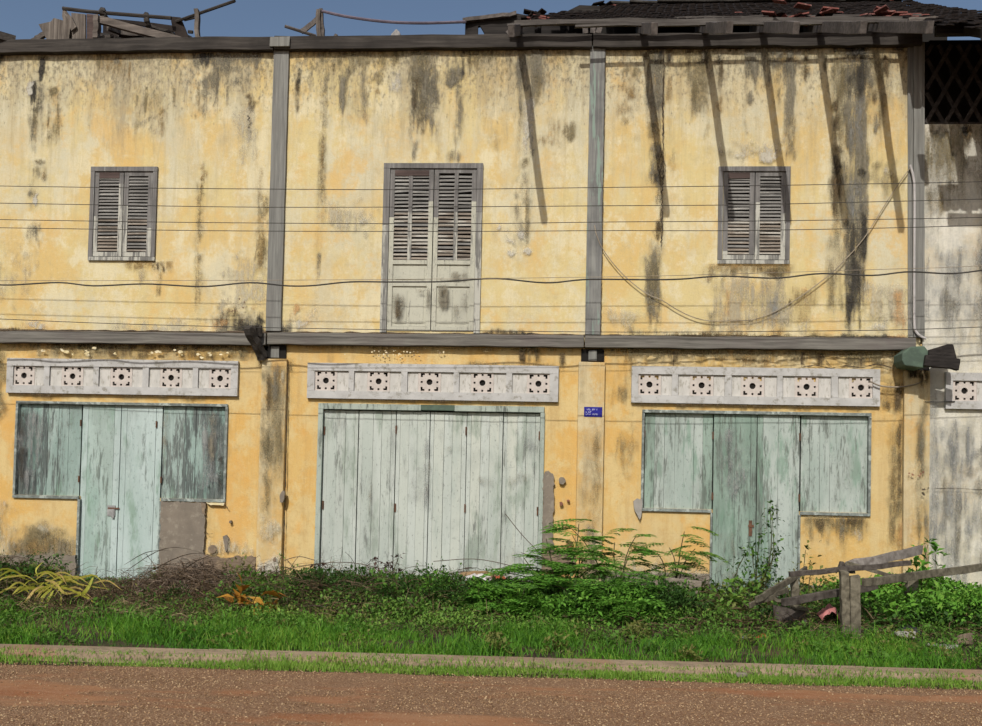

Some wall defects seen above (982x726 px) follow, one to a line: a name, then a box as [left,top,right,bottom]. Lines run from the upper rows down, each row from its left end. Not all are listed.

water stain [30,57,59,139]
water stain [320,50,497,132]
water stain [625,49,672,191]
water stain [745,47,812,156]
water stain [802,47,907,338]
water stain [645,209,662,317]
water stain [669,264,795,337]
water stain [258,361,291,463]
water stain [610,348,893,369]
water stain [883,370,929,538]
water stain [917,400,933,471]
water stain [917,426,982,579]